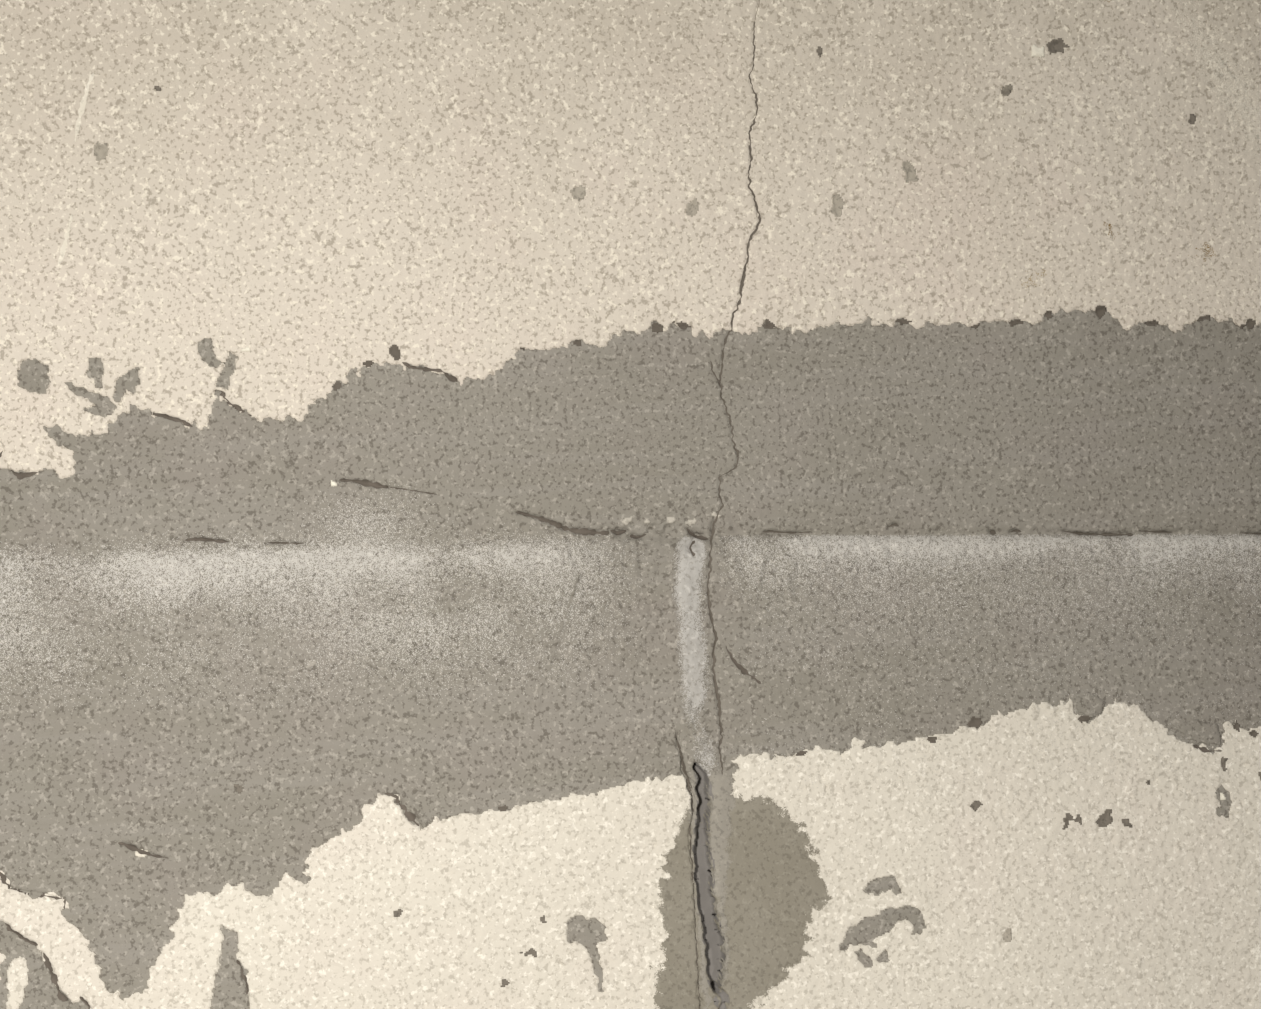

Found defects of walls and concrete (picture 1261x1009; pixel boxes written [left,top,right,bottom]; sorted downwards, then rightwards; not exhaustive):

crack [516,0,761,1009]
crack [764,528,810,536]
crack [1063,529,1172,537]
peeling [0,305,1261,1009]
water stain [649,793,832,1009]